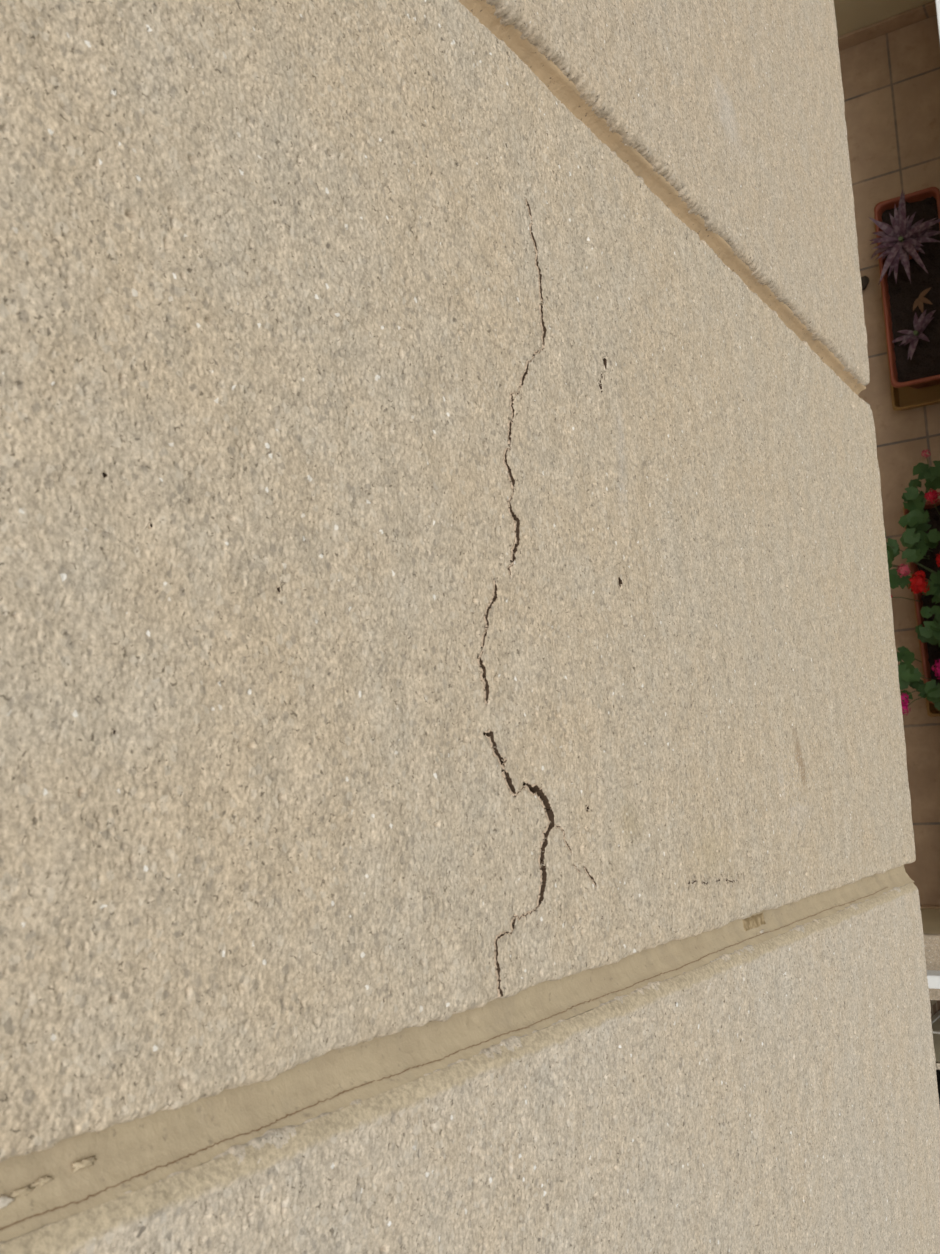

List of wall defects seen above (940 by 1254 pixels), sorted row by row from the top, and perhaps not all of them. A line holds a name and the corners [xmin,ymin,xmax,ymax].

crack [477,198,597,997]
crack [688,878,737,886]
crack [0,887,888,1230]